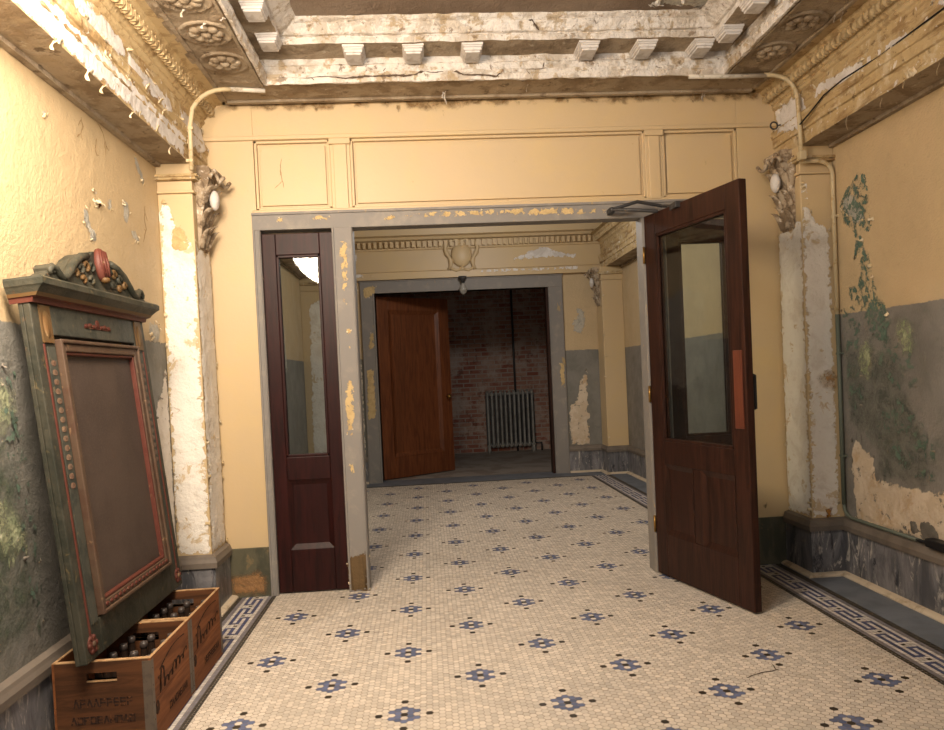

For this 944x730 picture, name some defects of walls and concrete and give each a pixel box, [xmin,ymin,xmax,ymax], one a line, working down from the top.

peeling [14,0,209,155]
peeling [772,32,907,133]
peeling [880,59,940,105]
peeling [384,207,606,220]
peeling [840,174,918,390]
peeling [149,200,228,555]
peeling [569,368,590,445]
peeling [777,181,840,517]
peeling [851,438,944,540]